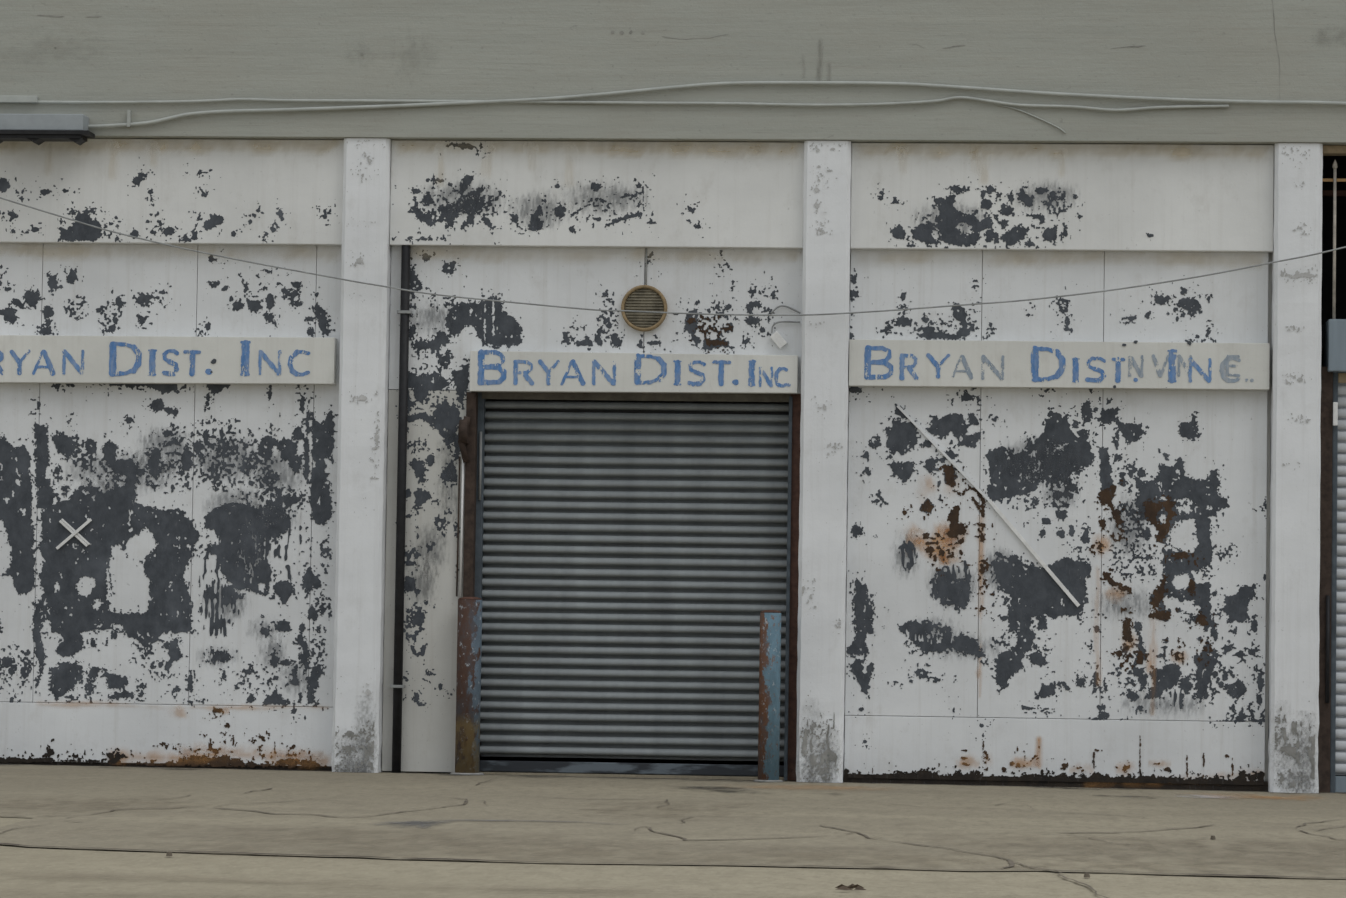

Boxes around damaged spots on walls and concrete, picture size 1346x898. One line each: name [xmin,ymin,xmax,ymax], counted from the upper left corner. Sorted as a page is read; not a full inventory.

peeling [0,157,335,338]
peeling [550,250,783,354]
peeling [677,194,711,238]
peeling [873,177,1085,249]
peeling [392,141,662,712]
peeling [0,359,339,724]
rust [896,464,997,616]
peeling [800,385,1315,790]
rust [1089,479,1221,686]
spalling [335,720,375,773]